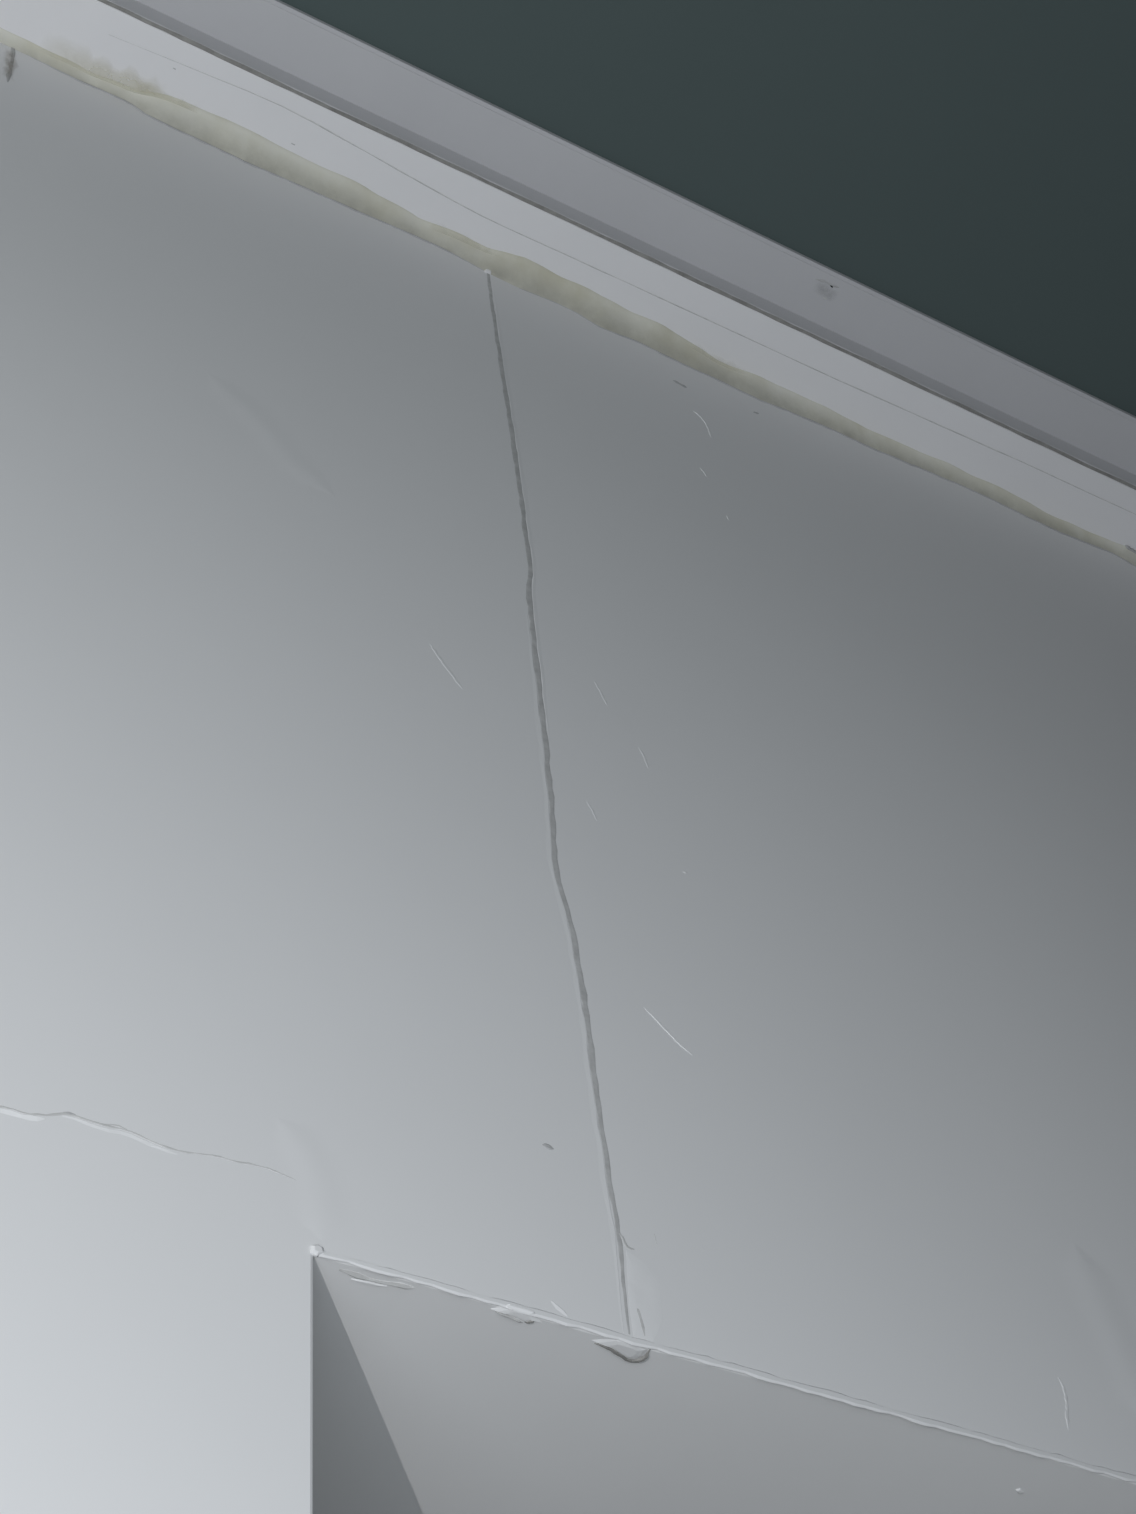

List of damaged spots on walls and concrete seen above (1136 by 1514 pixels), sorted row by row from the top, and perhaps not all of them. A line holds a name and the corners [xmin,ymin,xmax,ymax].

crack [0,48,663,1341]
crack [519,288,1136,567]